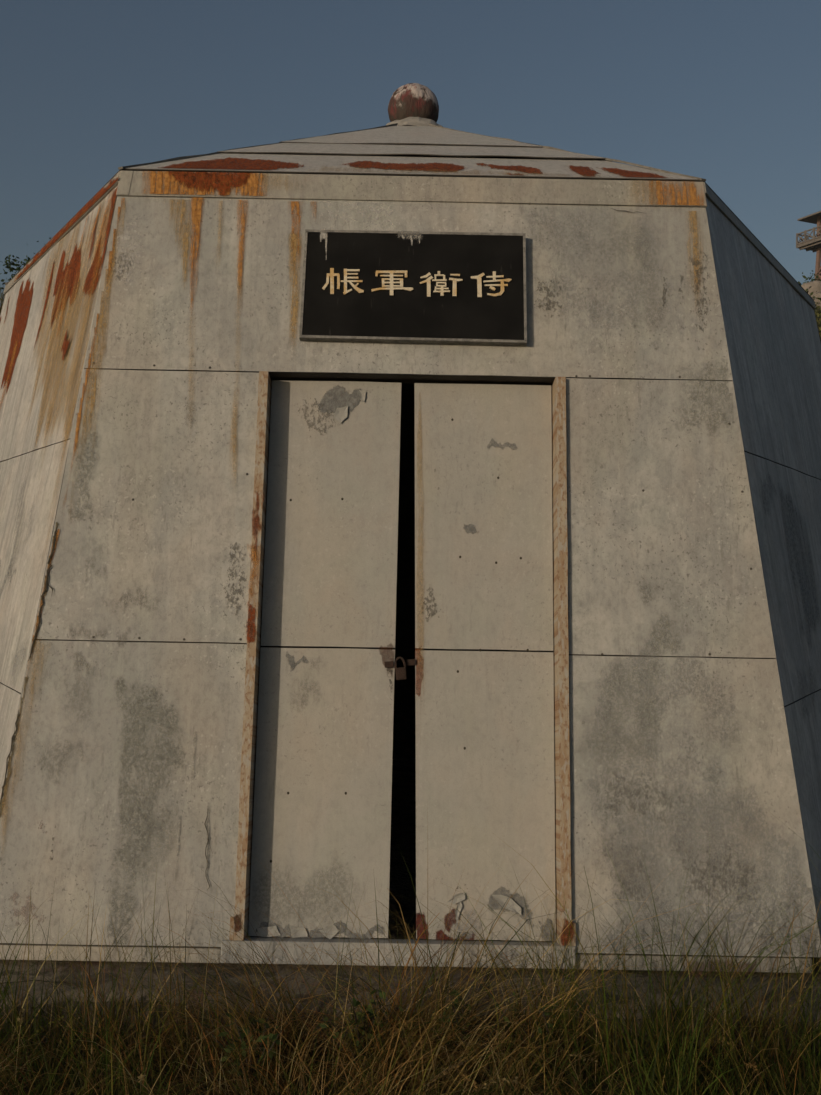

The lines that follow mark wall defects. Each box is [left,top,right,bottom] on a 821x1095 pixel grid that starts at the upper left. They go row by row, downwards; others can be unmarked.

corrosion [148,157,304,289]
corrosion [342,161,464,172]
corrosion [477,163,543,175]
corrosion [569,165,711,330]
corrosion [0,178,125,455]
peeling [319,385,366,423]
corrosion [246,493,261,643]
damp [109,680,180,945]
peeling [256,921,384,939]
peeling [489,887,555,942]